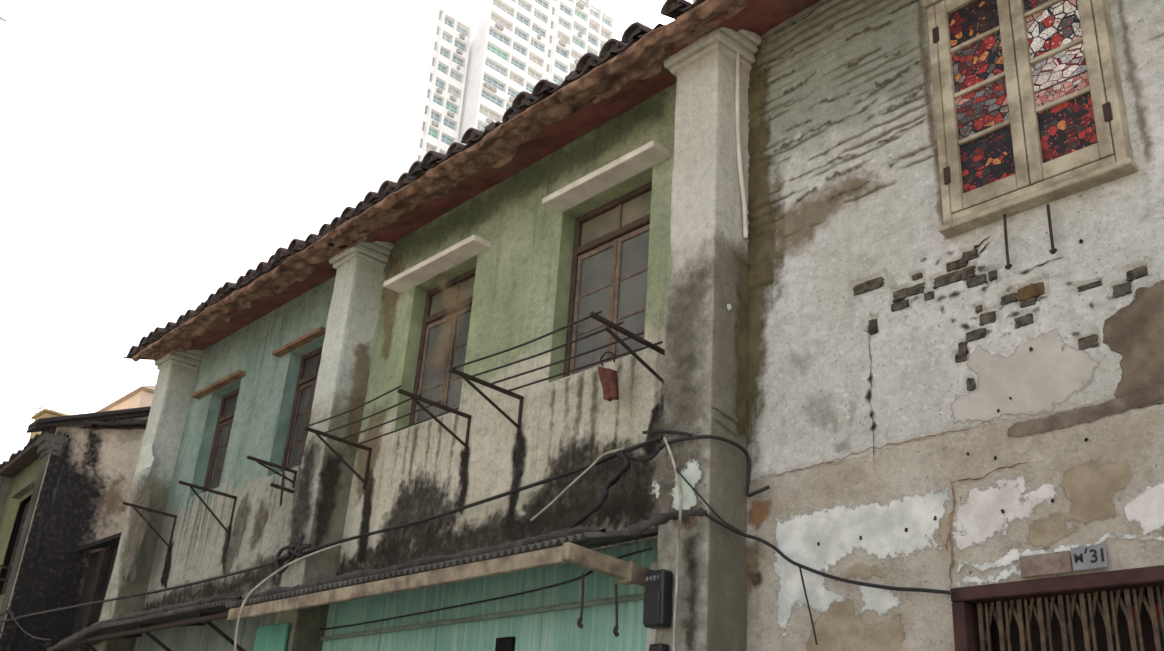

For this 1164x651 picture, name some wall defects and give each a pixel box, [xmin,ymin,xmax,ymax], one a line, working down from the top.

damp [0,424,151,651]
damp [142,256,714,611]
peeling [651,459,702,511]
damp [683,533,699,649]
crack [753,313,1009,481]
peeling [772,460,1164,651]
peeling [853,249,1164,423]